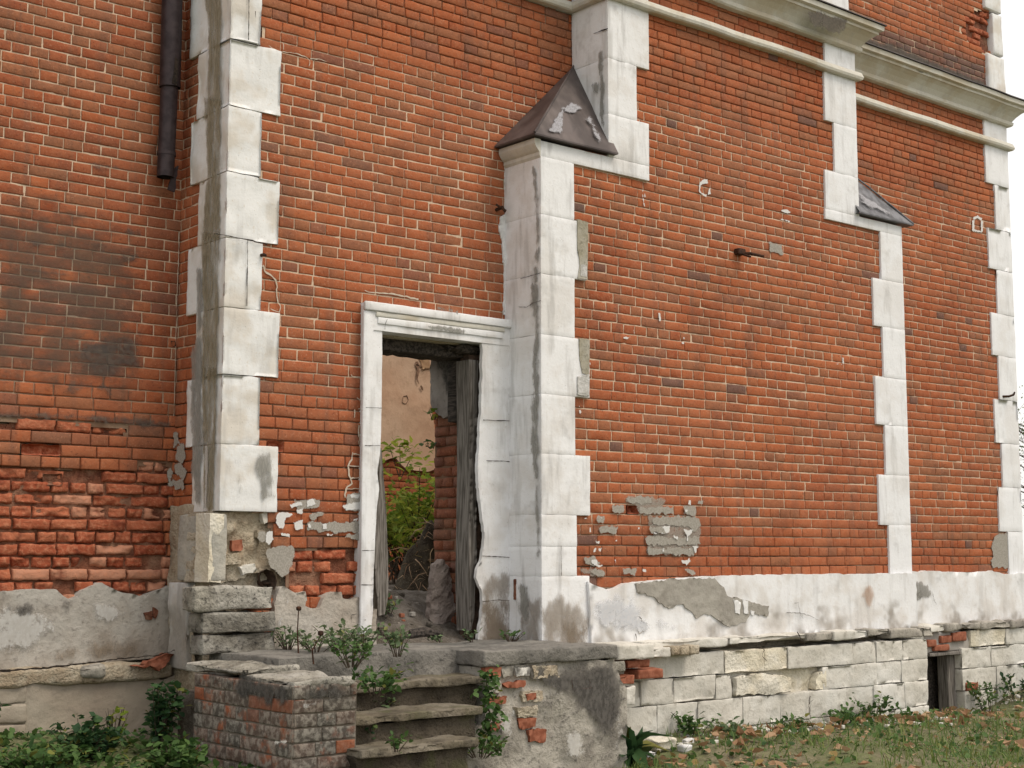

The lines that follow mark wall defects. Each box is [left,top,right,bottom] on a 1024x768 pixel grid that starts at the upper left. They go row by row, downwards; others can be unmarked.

water stain [530,167,540,556]
water stain [256,453,272,499]
peeling [343,494,360,521]
hole [626,504,639,514]
spalling [183,499,377,649]
peeling [634,526,769,627]
spalling [143,607,158,620]
water stain [520,585,528,621]
spalling [130,653,174,671]
spalling [481,665,559,743]